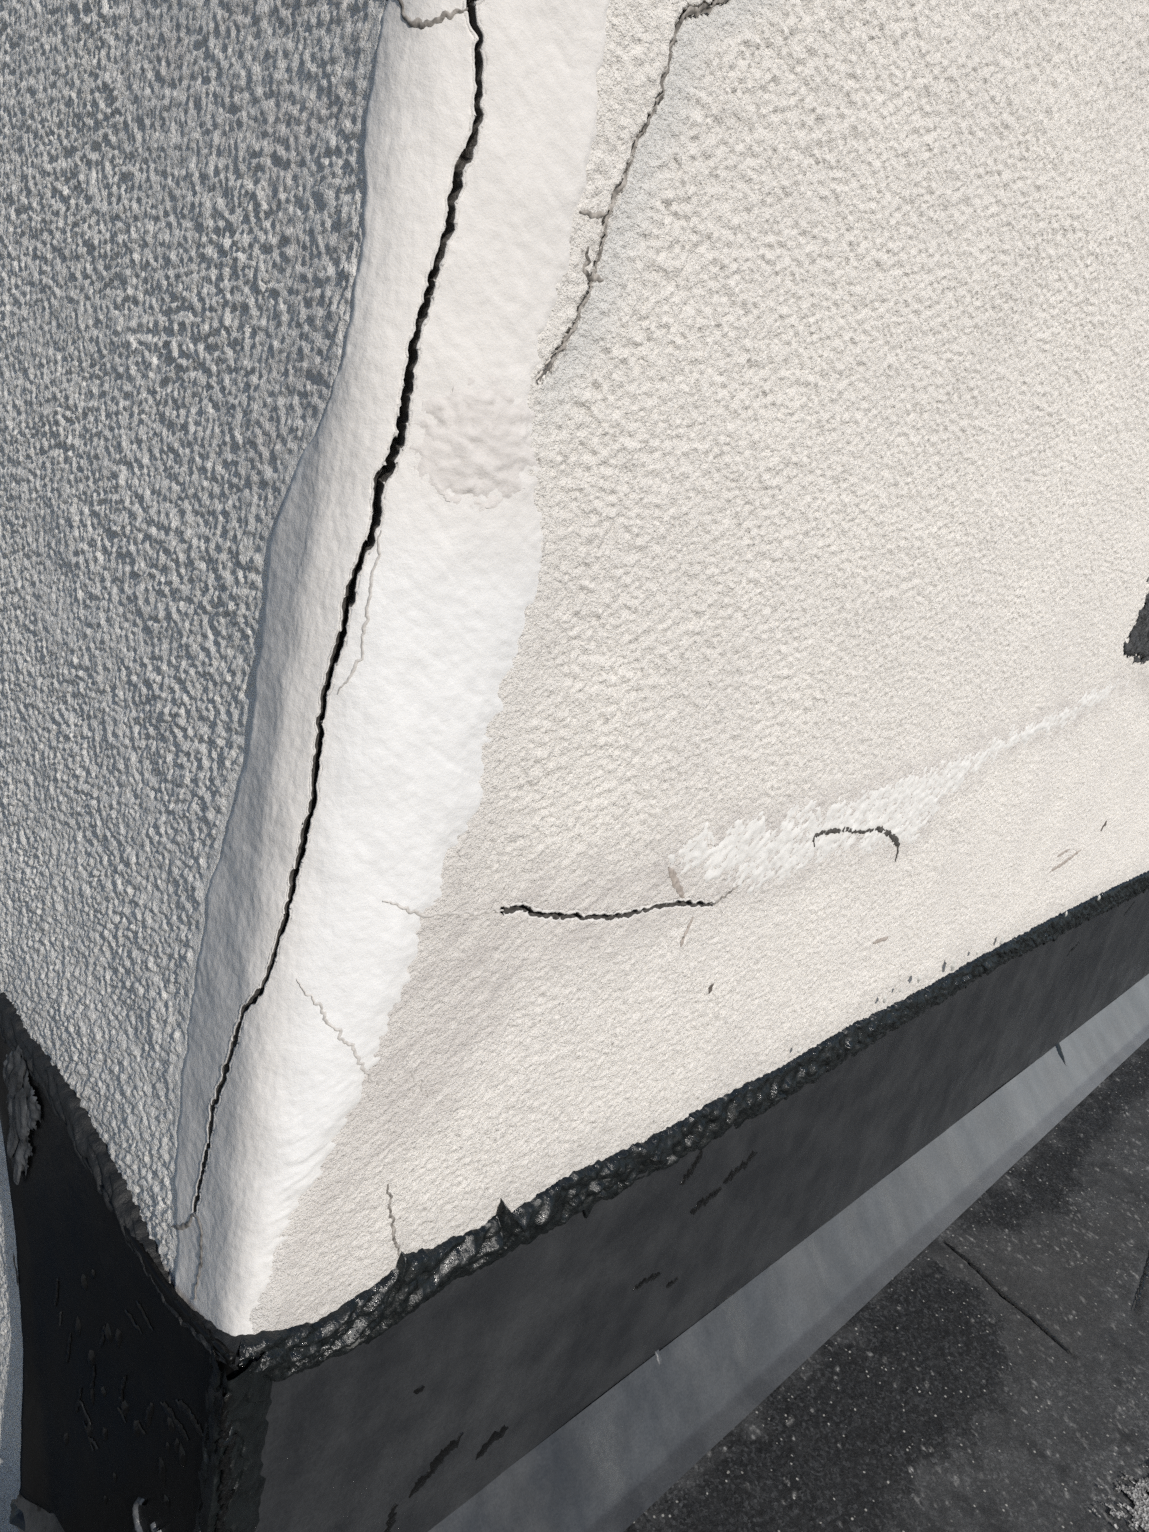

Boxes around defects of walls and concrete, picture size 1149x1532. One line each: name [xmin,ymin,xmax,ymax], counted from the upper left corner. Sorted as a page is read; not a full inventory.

crack [539,0,727,382]
crack [171,0,486,1301]
crack [812,826,900,862]
crack [383,881,744,923]
damp [690,1150,758,1215]
damp [476,1425,509,1460]
damp [385,1432,464,1532]